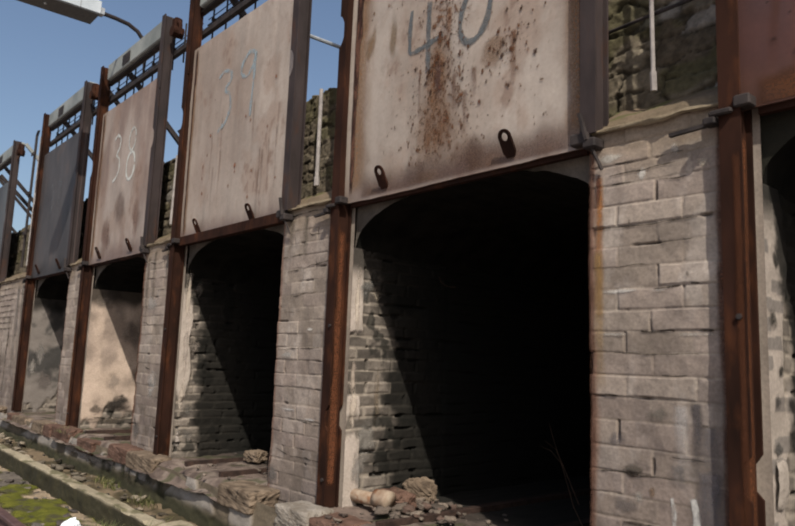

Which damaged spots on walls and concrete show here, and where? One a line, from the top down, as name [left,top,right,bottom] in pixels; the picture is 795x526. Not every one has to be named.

rust [349,0,566,196]
rust [760,67,795,103]
crack [598,216,697,245]
flaking render [186,278,202,314]
rust [717,134,730,526]
rust [733,140,757,526]
flaking render [350,362,374,486]
crack [598,469,675,481]
crack [624,518,652,526]